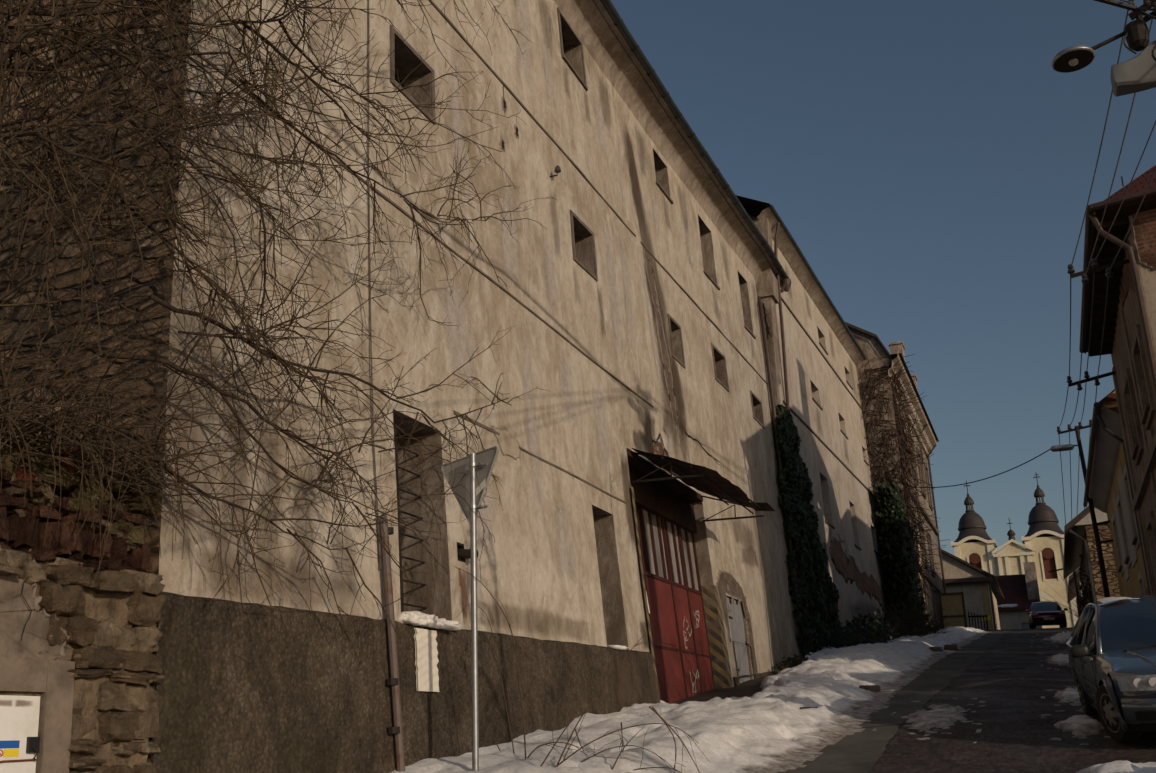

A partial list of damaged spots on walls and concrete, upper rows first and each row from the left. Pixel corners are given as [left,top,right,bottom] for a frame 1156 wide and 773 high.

water stain [627,138,685,452]
spalling [1119,208,1156,308]
spalling [822,536,883,609]